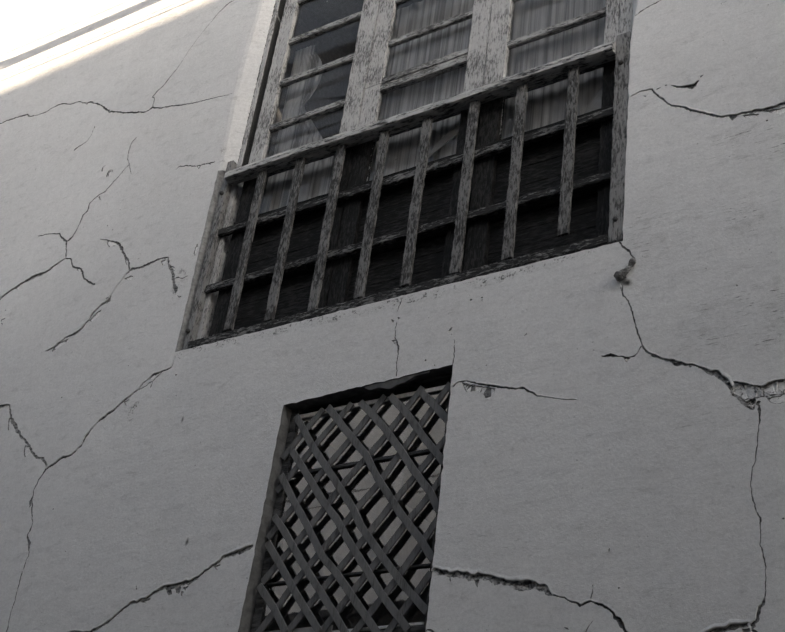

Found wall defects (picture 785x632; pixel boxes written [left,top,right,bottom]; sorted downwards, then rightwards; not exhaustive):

crack [630,75,785,121]
crack [0,138,187,352]
crack [0,353,253,632]
crack [449,327,577,400]
crack [431,565,632,632]
crack [602,284,785,632]